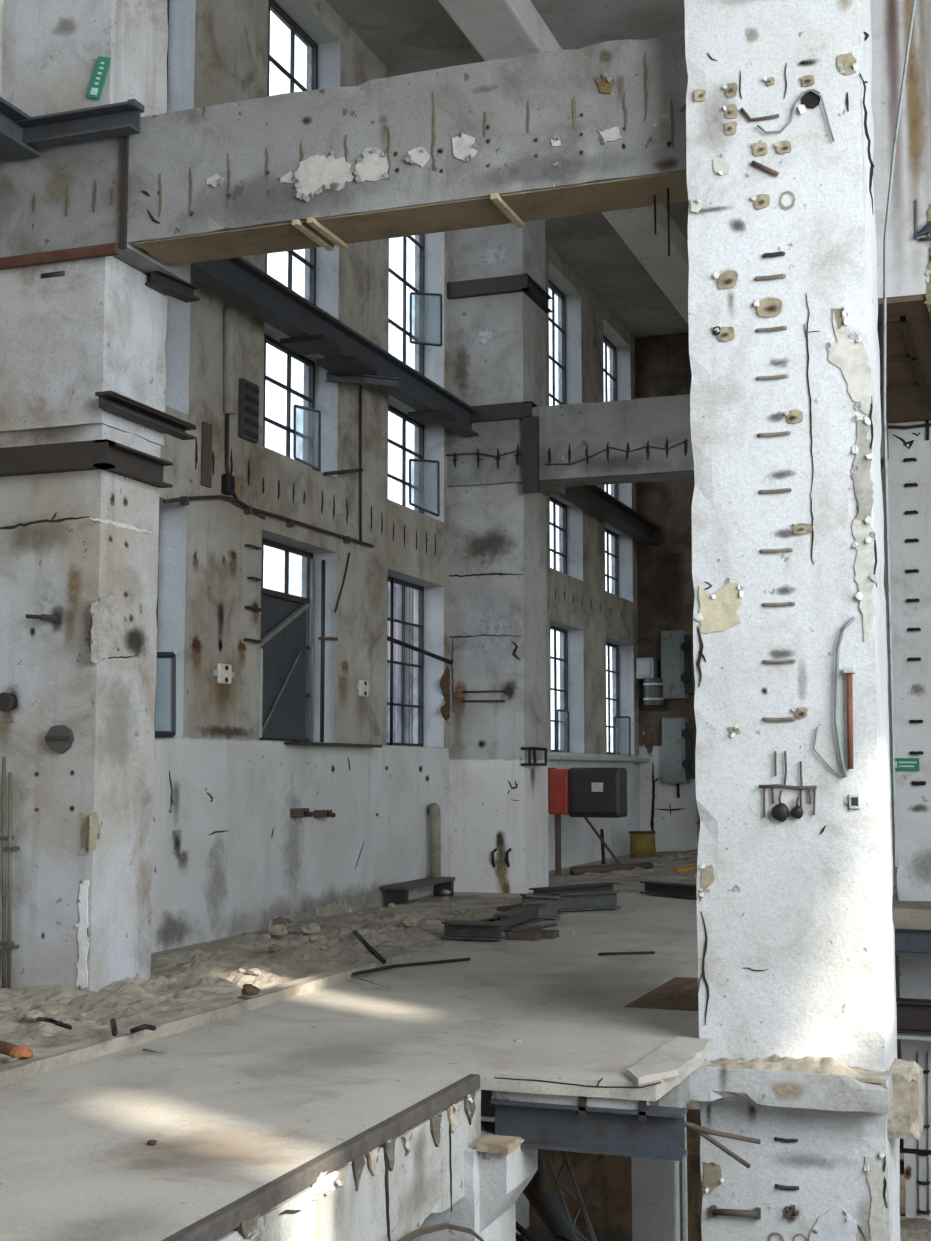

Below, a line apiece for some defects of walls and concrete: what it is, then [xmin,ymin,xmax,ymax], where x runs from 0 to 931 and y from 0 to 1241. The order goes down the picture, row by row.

peeling [278,147,389,203]
peeling [405,147,430,167]
peeling [452,132,479,163]
crack [846,73,875,212]
crack [0,512,152,534]
peeling [694,578,745,633]
crack [696,626,706,687]
crack [698,911,709,1025]
spalling [429,1093,476,1147]
spalling [335,1130,414,1191]